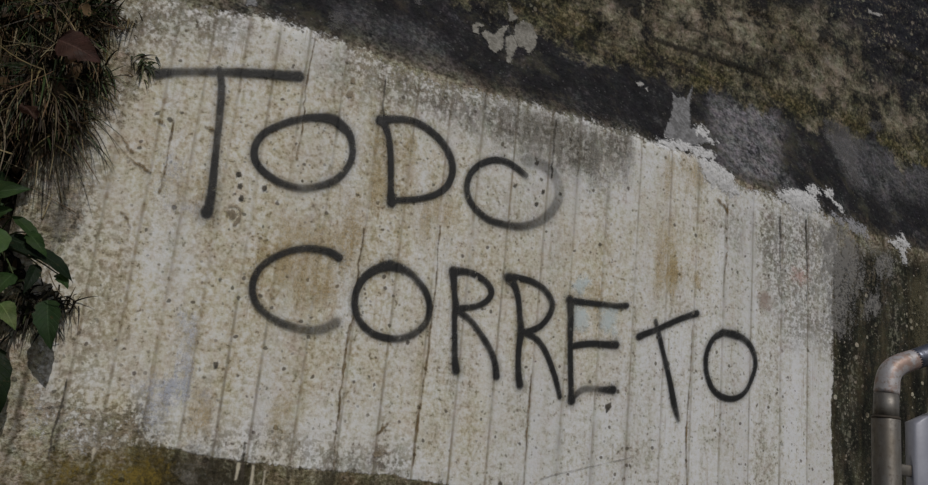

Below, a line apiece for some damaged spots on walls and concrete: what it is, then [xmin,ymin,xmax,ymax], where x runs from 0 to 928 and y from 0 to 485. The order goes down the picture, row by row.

peeling [472,3,538,63]
peeling [664,86,709,145]
water stain [655,123,742,198]
water stain [776,182,870,238]
water stain [885,234,911,264]